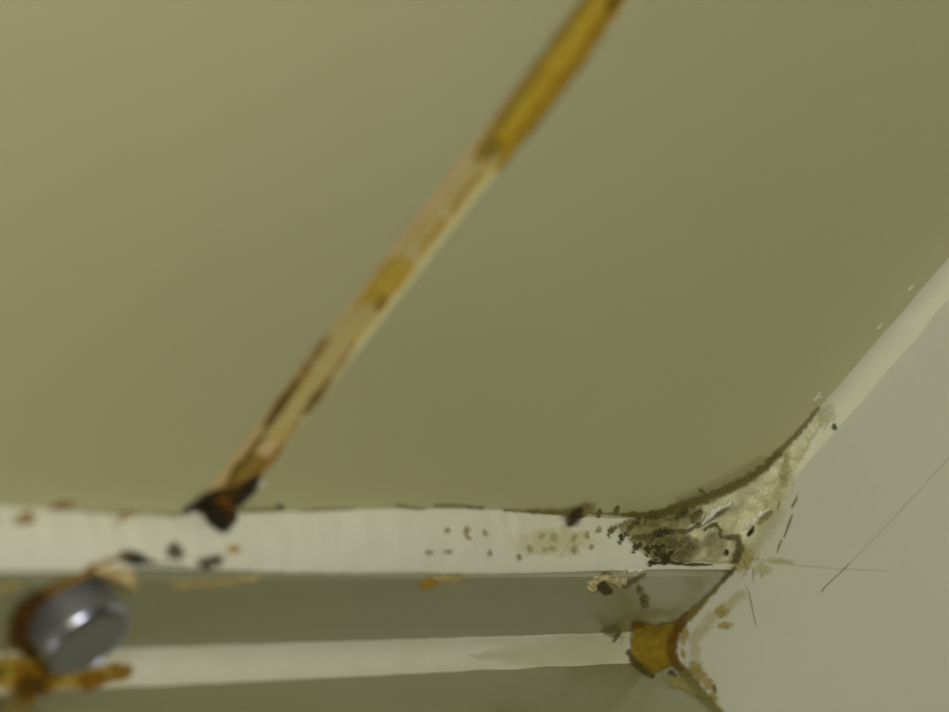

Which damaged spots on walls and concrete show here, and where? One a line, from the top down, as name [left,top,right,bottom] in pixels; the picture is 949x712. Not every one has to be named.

water stain [571,505,754,567]
rust [0,571,132,704]
spalling [587,569,650,609]
rust [603,613,717,700]
rust [715,606,729,628]